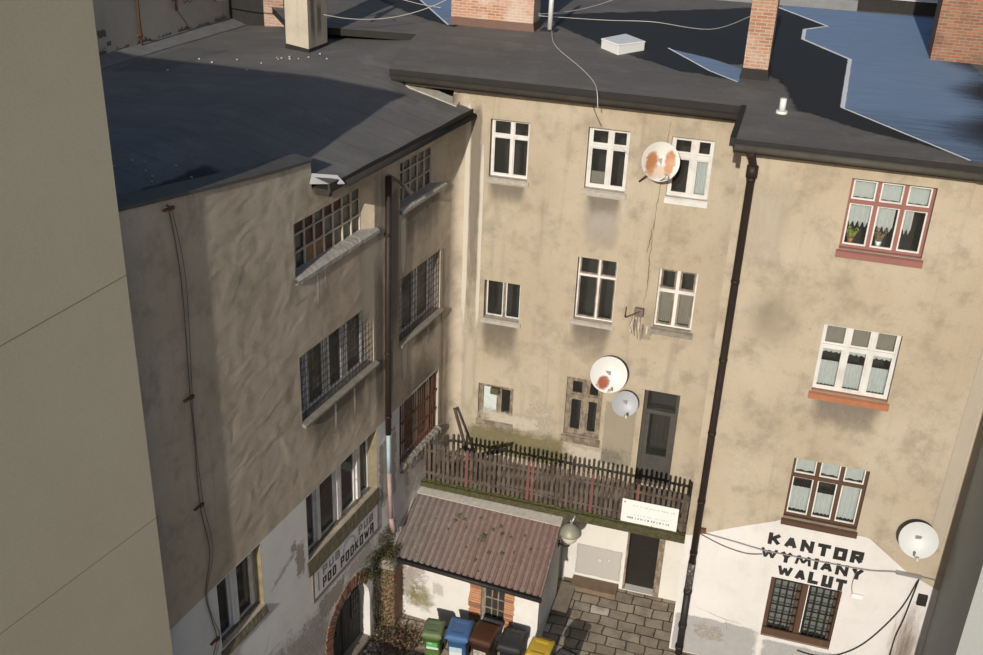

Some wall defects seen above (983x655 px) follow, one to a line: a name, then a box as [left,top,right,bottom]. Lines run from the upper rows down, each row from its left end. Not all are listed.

leakage [590,196,618,207]
leakage [461,103,523,404]
leakage [316,170,439,428]
leakage [575,324,607,337]
leakage [469,409,620,473]
peeling [291,543,305,576]
leakage [671,613,832,655]